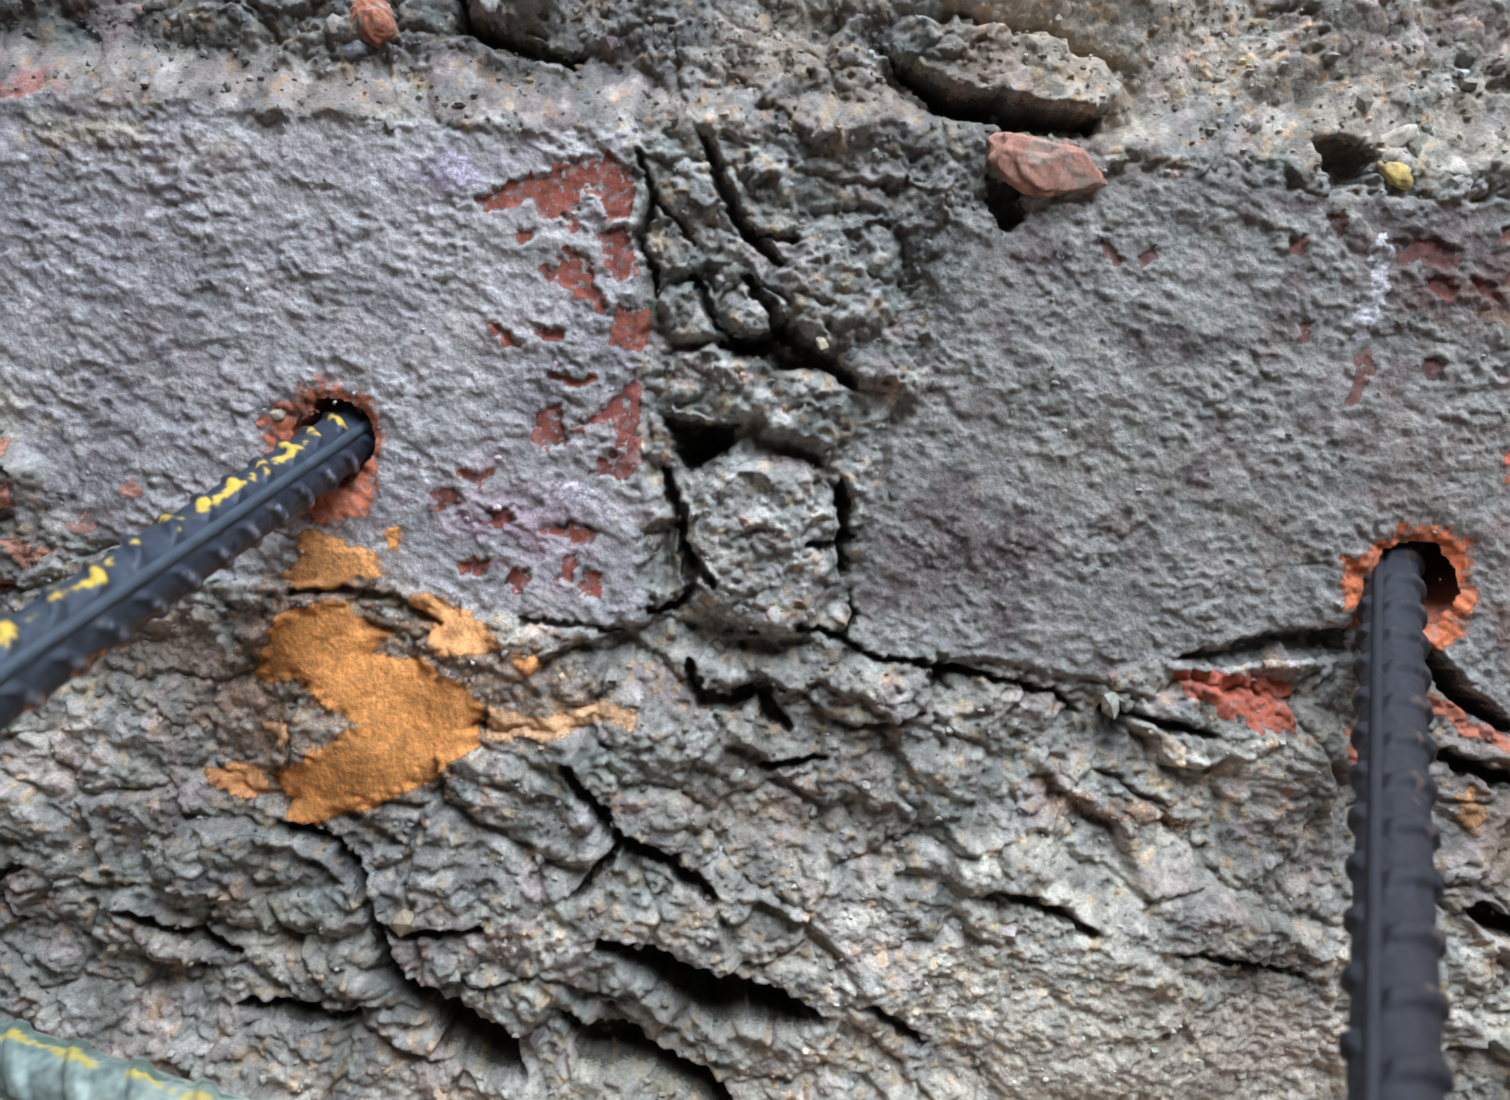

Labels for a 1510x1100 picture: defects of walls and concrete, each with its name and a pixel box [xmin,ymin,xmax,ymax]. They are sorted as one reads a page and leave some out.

peeling [473,149,652,482]
crack [632,132,858,390]
corrosion [255,393,317,429]
spalling [0,376,386,735]
crack [523,465,716,634]
crack [795,478,1216,739]
crack [684,657,827,773]
crack [1424,651,1510,789]
crack [559,765,718,906]
spalling [1172,522,1510,1100]
spalling [562,1010,733,1100]
spalling [597,938,820,1027]